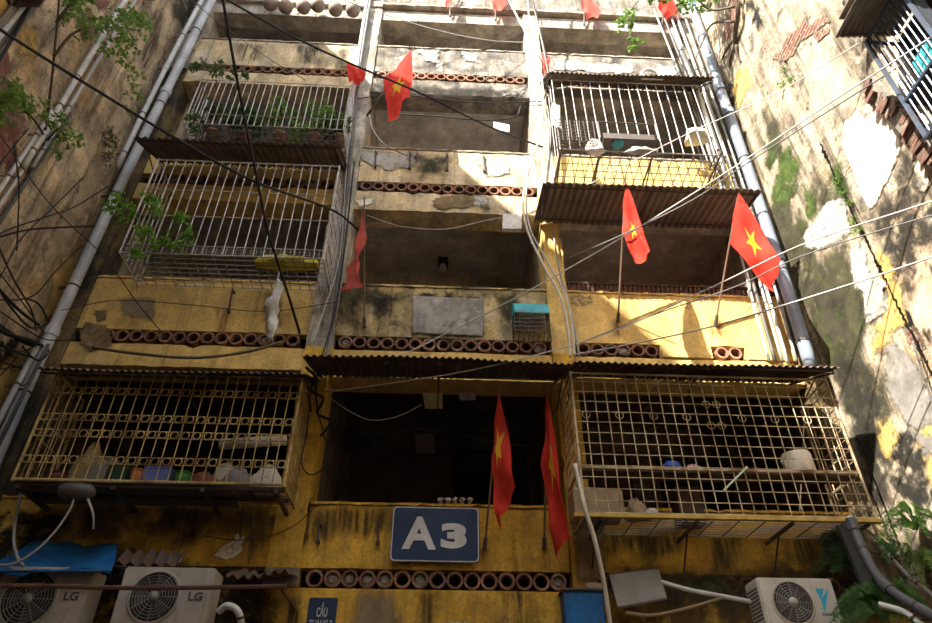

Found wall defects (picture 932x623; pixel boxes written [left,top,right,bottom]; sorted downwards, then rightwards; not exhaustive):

spalling [771,13,830,61]
water stain [762,108,782,153]
flaking render [808,52,903,211]
peeling [355,198,374,207]
peeling [360,149,449,174]
peeling [432,194,490,211]
water stain [811,172,836,208]
flaking render [912,160,929,193]
flaking render [804,198,888,324]
crack [820,144,932,377]
water stain [771,202,932,506]
water stain [304,500,385,542]